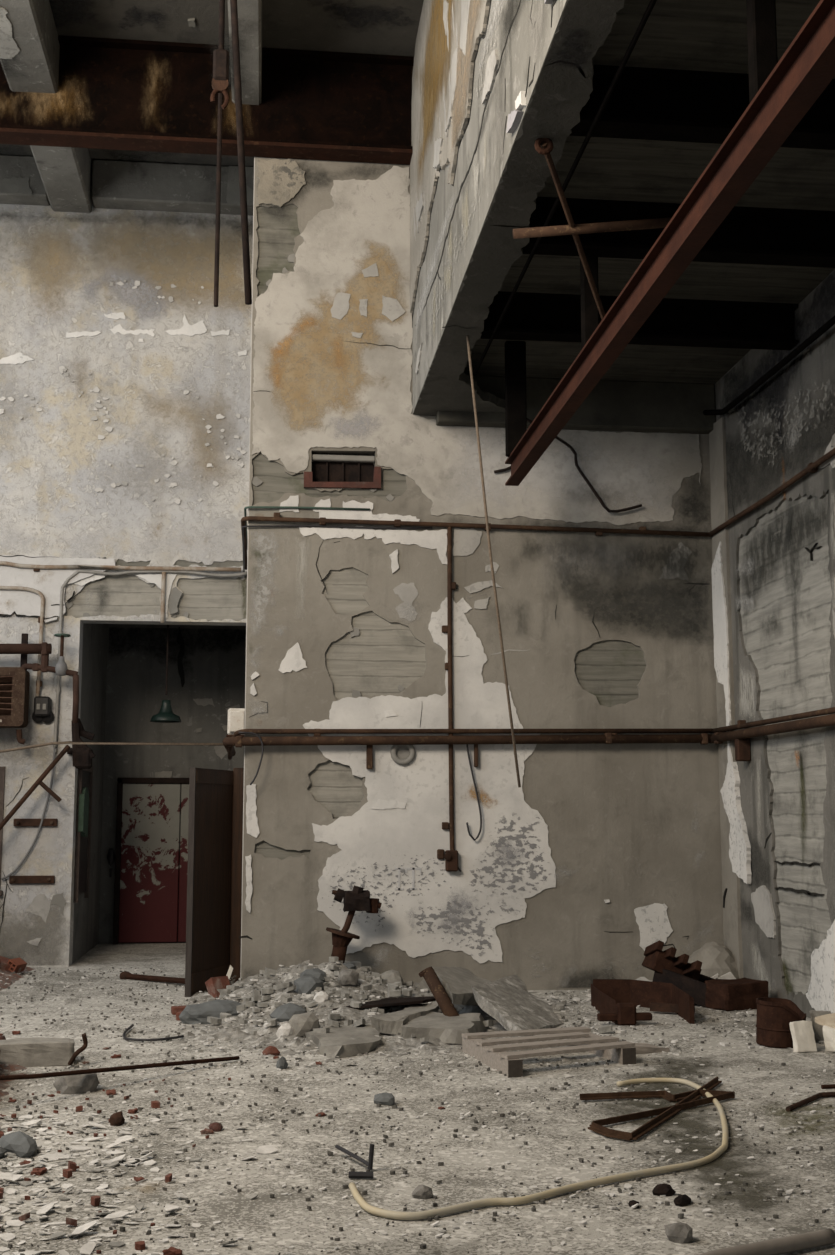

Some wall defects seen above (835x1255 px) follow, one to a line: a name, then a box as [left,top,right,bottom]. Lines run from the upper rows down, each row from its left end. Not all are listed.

peeling [0,7,20,59]
rust [33,82,70,114]
water stain [420,0,513,168]
crack [346,0,585,349]
peeling [0,352,34,365]
peeling [66,312,230,343]
water stain [269,218,452,436]
peeling [193,0,703,963]
peeling [819,434,835,468]
spalling [0,555,247,623]
spalling [711,494,835,1013]